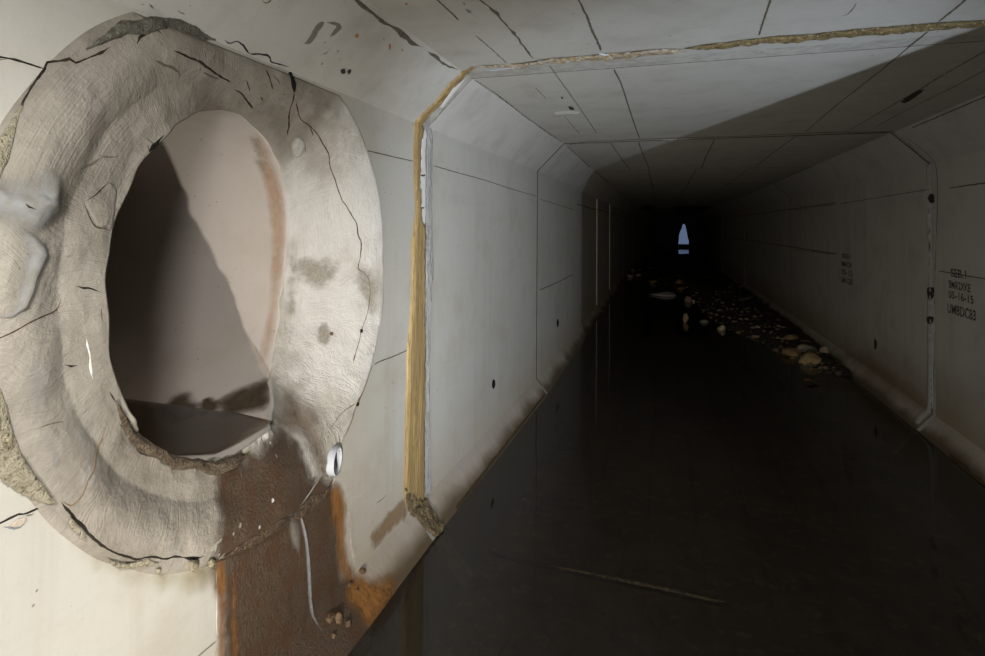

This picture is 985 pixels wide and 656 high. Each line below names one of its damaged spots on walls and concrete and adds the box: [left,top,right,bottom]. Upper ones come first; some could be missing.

crack [0,47,110,105]
crack [137,30,288,109]
spalling [284,72,296,135]
crack [82,155,113,169]
peeling [85,182,117,231]
crack [296,103,372,431]
crack [0,286,102,338]
spalling [116,400,251,475]
rust [216,478,392,656]